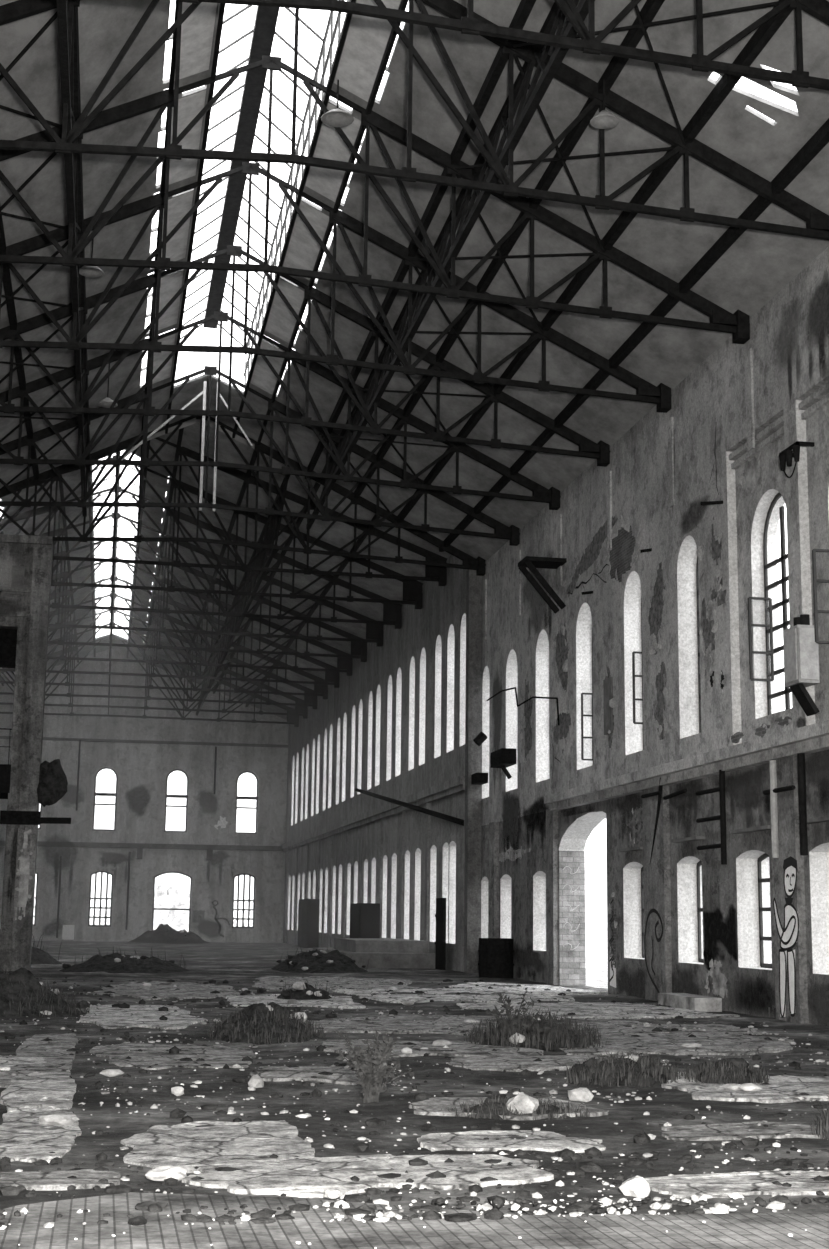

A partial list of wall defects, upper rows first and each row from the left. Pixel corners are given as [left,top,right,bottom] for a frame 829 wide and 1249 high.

leakage [777,280,829,399]
flaking render [562,514,642,597]
leakage [126,786,150,815]
leakage [199,791,217,813]